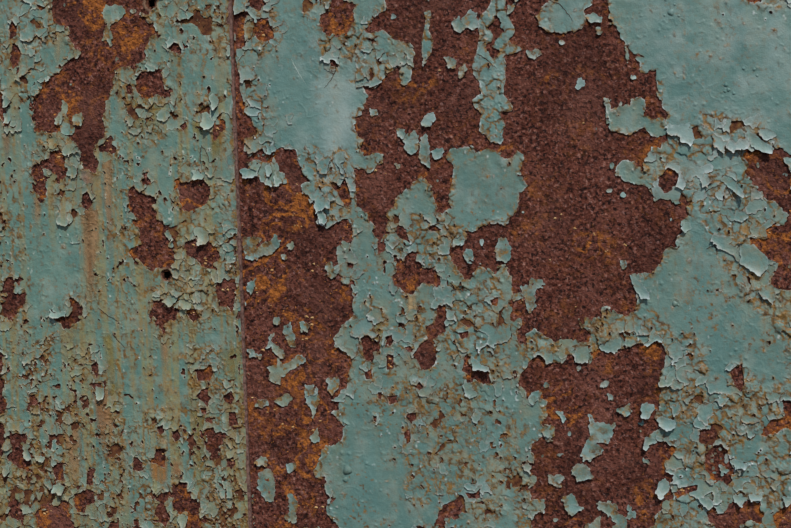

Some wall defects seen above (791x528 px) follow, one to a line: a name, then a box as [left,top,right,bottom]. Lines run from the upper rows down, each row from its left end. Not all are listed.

rust [0,270,31,321]
rust [27,0,188,278]
peeling [152,218,237,320]
peeling [159,0,294,155]
rust [123,0,698,528]
peeling [644,114,782,305]
rust [743,129,791,290]
rust [0,345,34,473]
peeling [0,396,82,528]
peeling [411,379,534,528]
peeling [596,310,791,528]
rust [689,424,791,528]